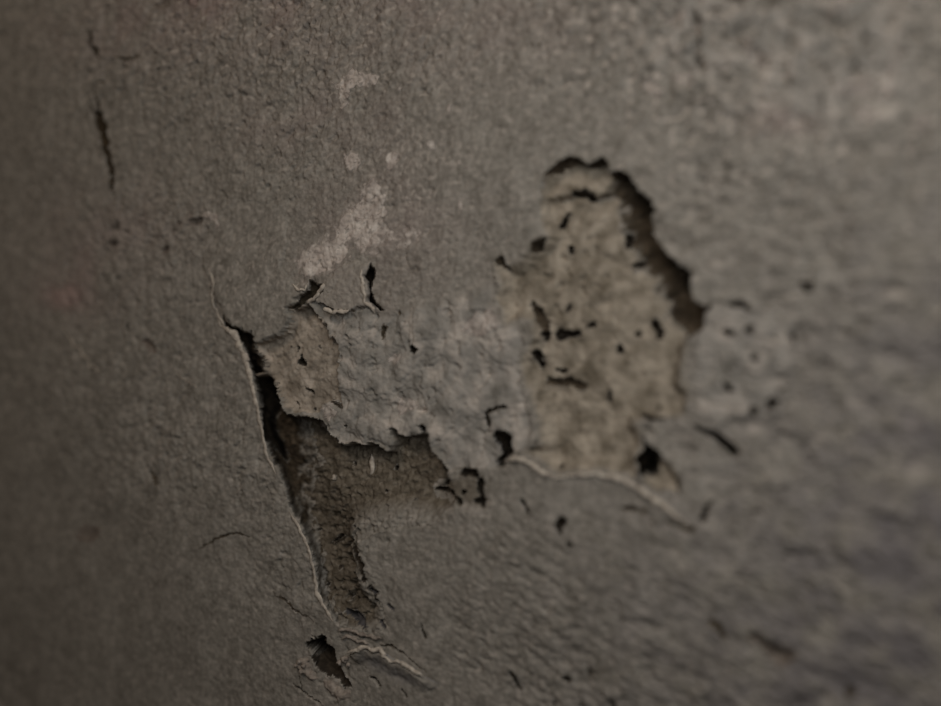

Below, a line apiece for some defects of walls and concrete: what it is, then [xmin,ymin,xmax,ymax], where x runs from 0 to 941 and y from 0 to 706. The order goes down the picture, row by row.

crack [87,18,116,201]
peeling [203,198,385,413]
spalling [491,156,803,494]
spalling [484,404,508,428]
spalling [433,465,492,512]
spalling [554,516,573,549]
spalling [665,500,714,534]
spalling [332,524,394,630]
peeling [336,645,440,697]